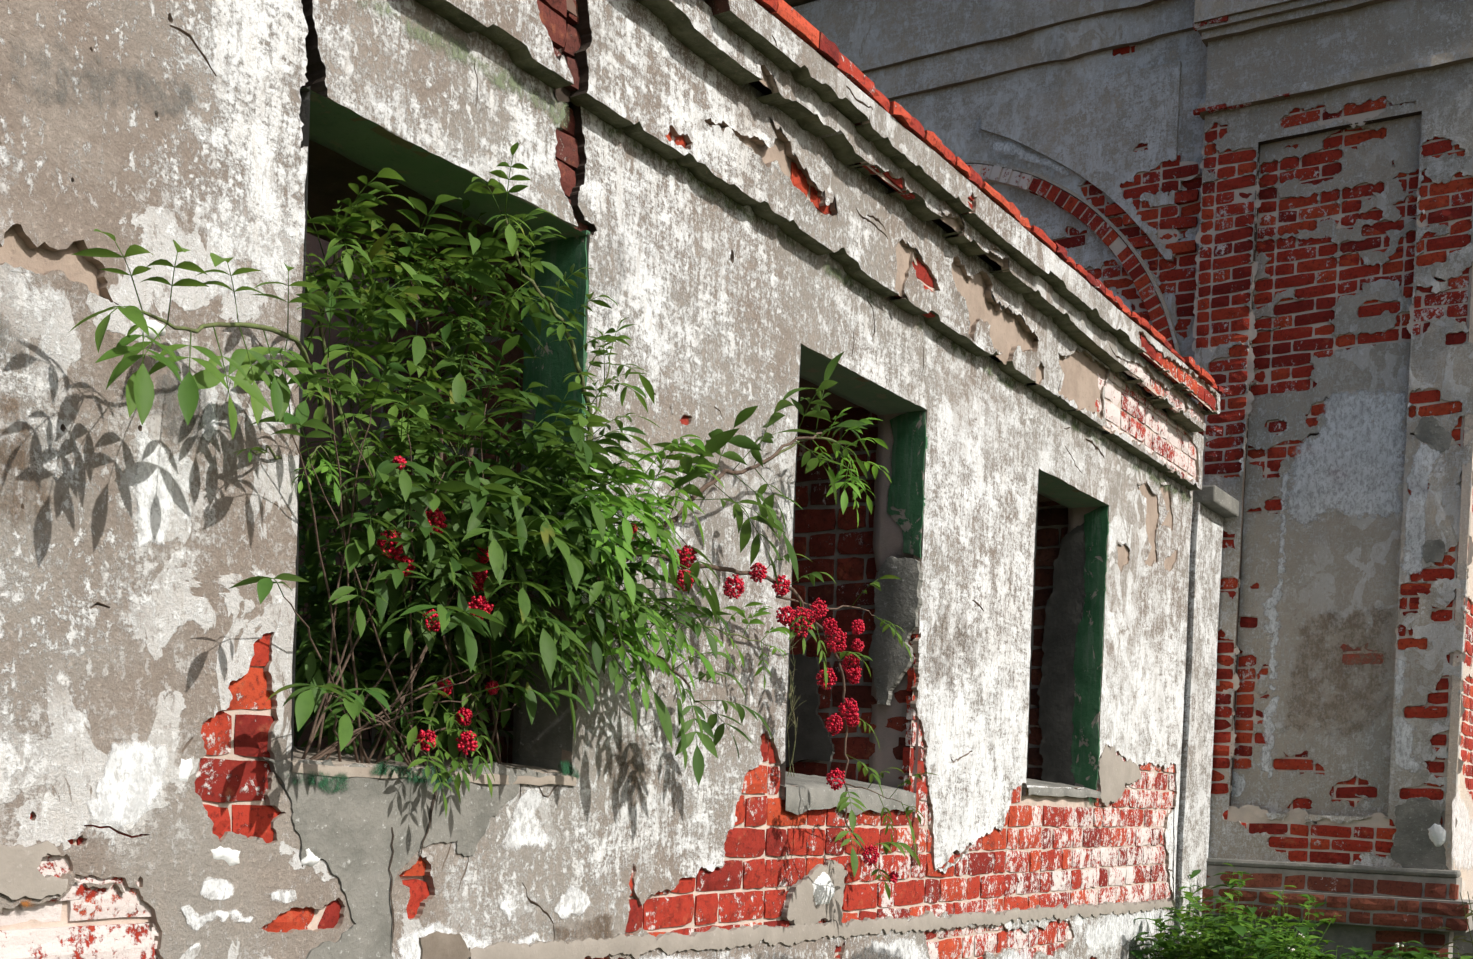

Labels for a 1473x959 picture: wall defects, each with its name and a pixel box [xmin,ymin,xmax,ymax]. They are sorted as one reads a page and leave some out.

peeling [0,226,102,297]
crack [537,0,589,231]
peeling [738,118,839,215]
peeling [894,241,936,318]
peeling [951,93,1473,571]
flaking render [0,825,159,959]
flaking render [194,632,282,843]
flaking render [399,857,429,919]
flaking render [625,634,1175,959]
peeling [1220,576,1261,599]
peeling [1211,616,1396,874]
peeling [1340,535,1473,828]